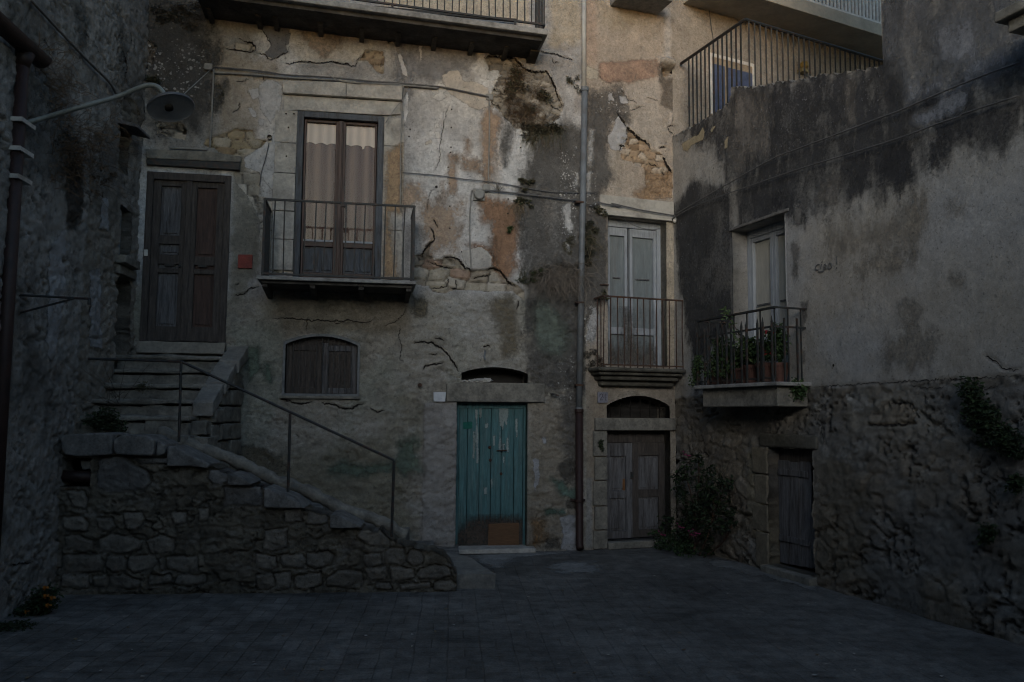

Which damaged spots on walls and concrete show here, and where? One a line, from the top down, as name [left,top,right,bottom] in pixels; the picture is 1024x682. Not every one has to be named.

peeling [263,25,291,59]
crack [226,29,364,113]
spalling [360,50,385,74]
spalling [425,54,564,145]
peeling [204,79,293,273]
spalling [608,116,673,199]
water stain [674,0,1024,392]
spalling [414,242,525,301]
water stain [491,86,635,482]
crack [275,308,457,369]